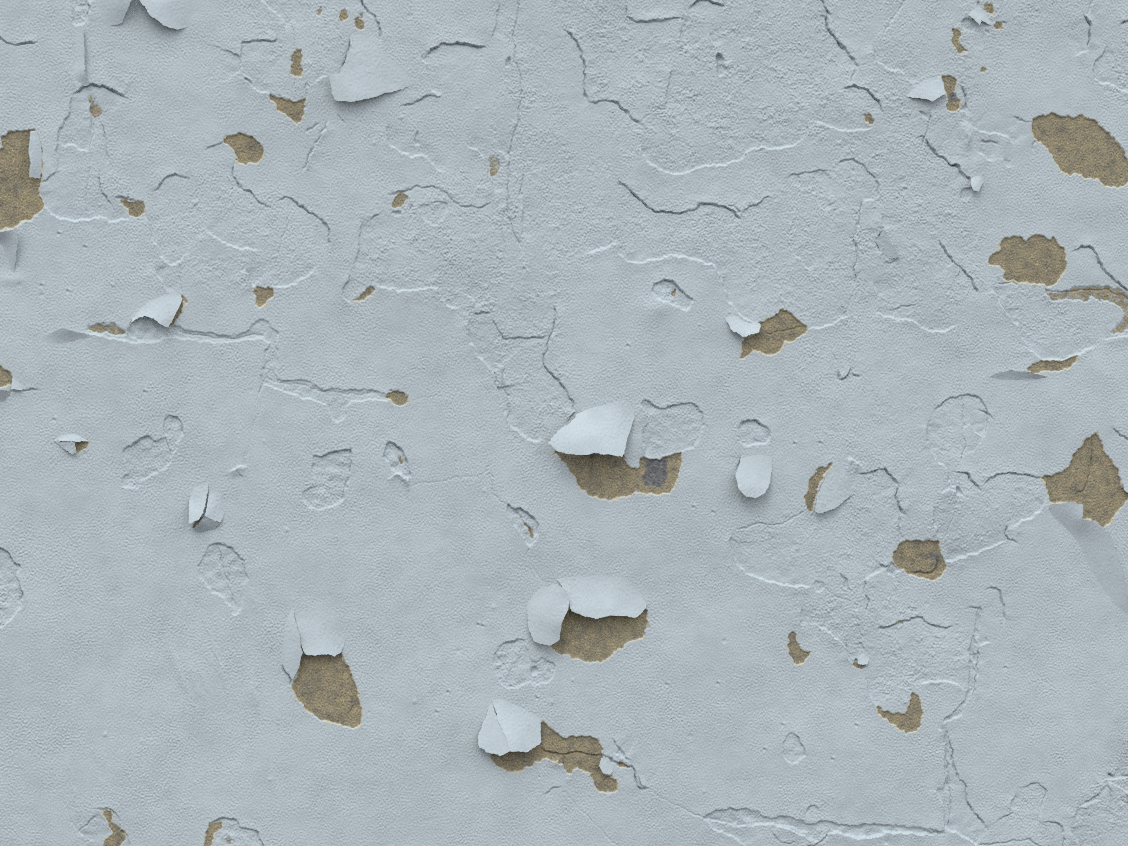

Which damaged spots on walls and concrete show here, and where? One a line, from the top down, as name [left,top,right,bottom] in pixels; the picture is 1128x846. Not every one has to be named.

spalling [0,0,204,348]
crack [167,318,447,475]
peeling [340,124,708,503]
crack [561,29,678,129]
crack [616,180,774,225]
crack [920,136,984,393]
spalling [970,112,1128,190]
crack [1042,243,1128,342]
spalling [860,431,1128,614]
peeling [276,606,365,730]
peeling [382,439,708,846]
crack [679,581,1042,846]